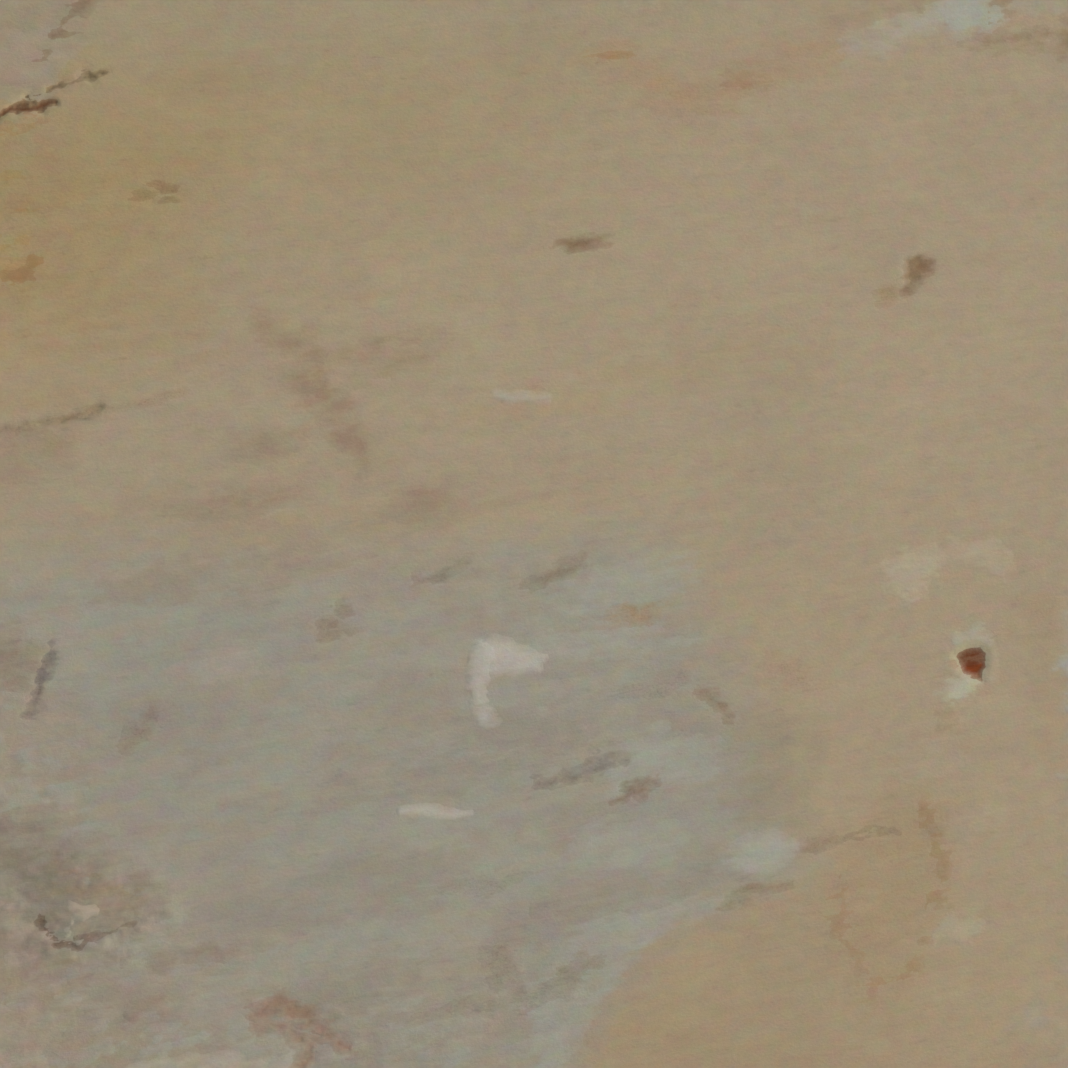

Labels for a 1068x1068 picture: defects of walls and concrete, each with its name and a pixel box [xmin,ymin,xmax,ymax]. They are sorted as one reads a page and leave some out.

peeling [835,0,1068,69]
crack [0,69,108,136]
crack [0,386,189,496]
peeling [518,549,589,597]
peeling [314,596,359,644]
crack [0,615,60,720]
peeling [463,632,549,707]
peeling [529,749,663,806]
peeling [726,828,800,876]